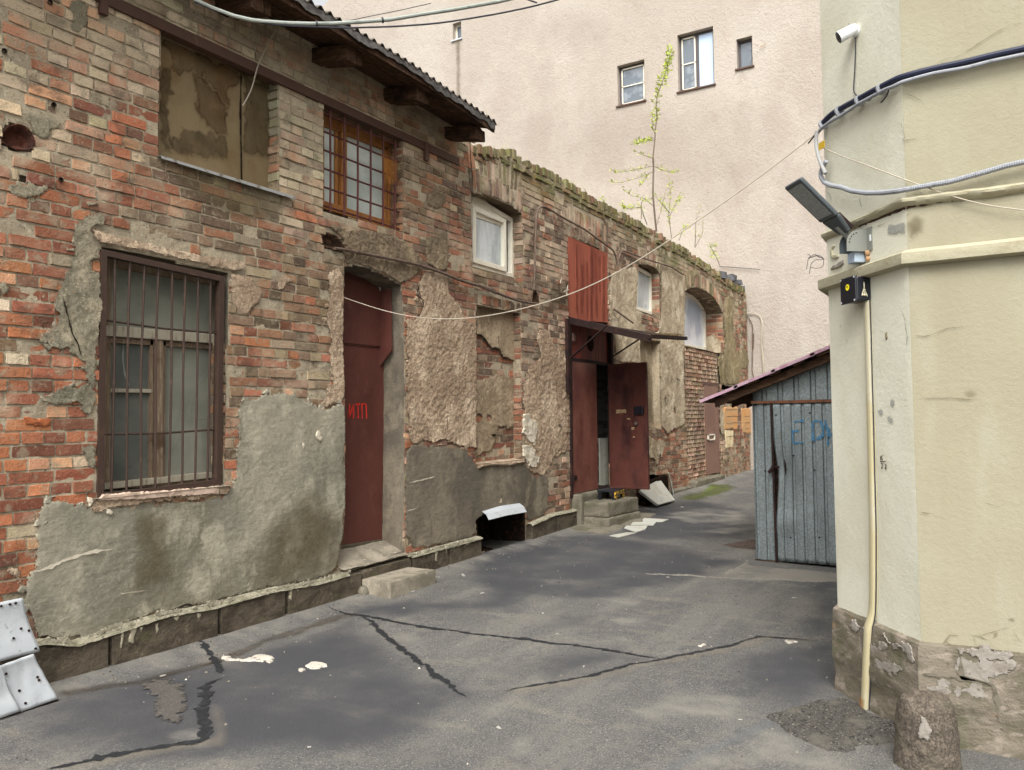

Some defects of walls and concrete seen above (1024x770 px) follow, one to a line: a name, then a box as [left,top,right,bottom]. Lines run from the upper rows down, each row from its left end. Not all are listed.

flaking render [38,202,105,414]
crack [62,296,83,358]
flaking render [307,224,569,476]
crack [48,640,225,769]
spalling [38,570,351,644]
crack [331,608,814,696]
peeling [843,618,915,676]
peeling [927,644,1017,699]